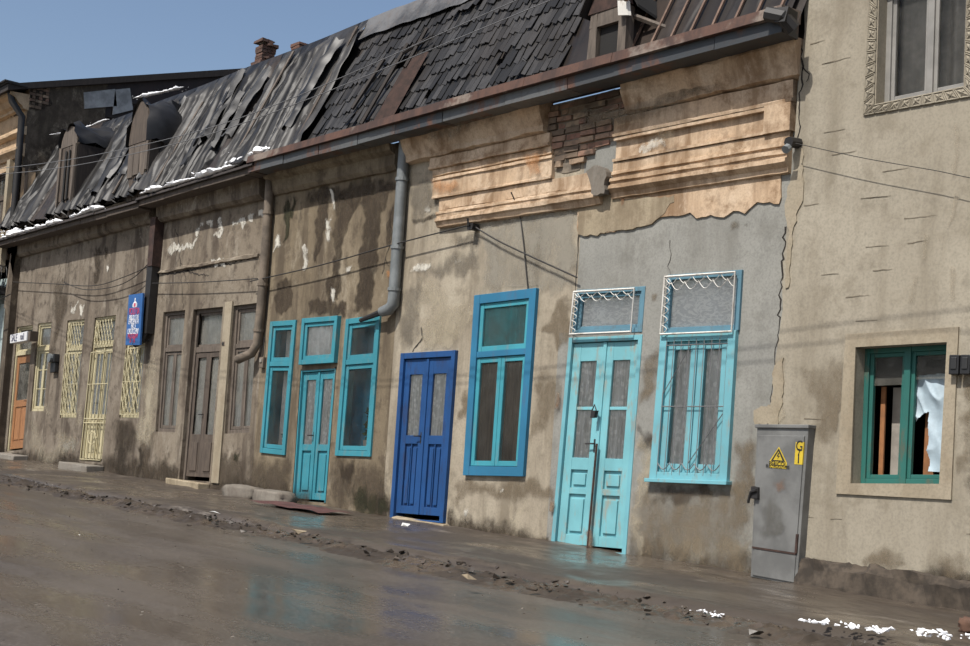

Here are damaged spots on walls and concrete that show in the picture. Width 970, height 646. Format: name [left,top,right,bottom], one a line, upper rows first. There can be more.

spalling [547,89,626,173]
peeling [168,209,263,256]
water stain [308,179,395,316]
water stain [410,182,439,218]
water stain [413,237,479,276]
spalling [577,194,674,236]
water stain [274,278,292,314]
crack [770,226,787,403]